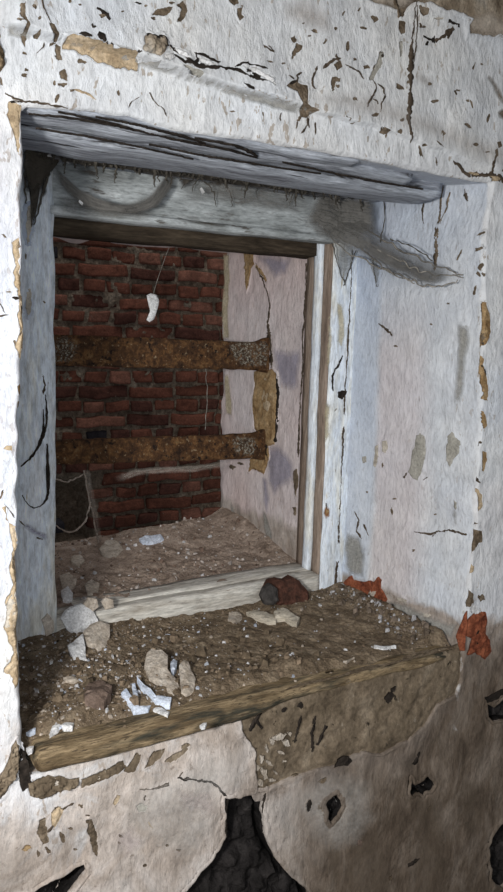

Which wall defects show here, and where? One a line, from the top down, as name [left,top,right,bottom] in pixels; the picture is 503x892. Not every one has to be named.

peeling [3,96,26,155]
peeling [14,0,206,104]
crack [170,45,386,112]
spalling [285,77,322,134]
spalling [357,0,503,157]
crack [453,155,503,186]
spalling [455,228,493,430]
spalling [229,366,280,475]
crack [414,529,467,537]
spalling [0,488,220,892]
crack [140,772,227,801]
spalling [181,588,492,892]